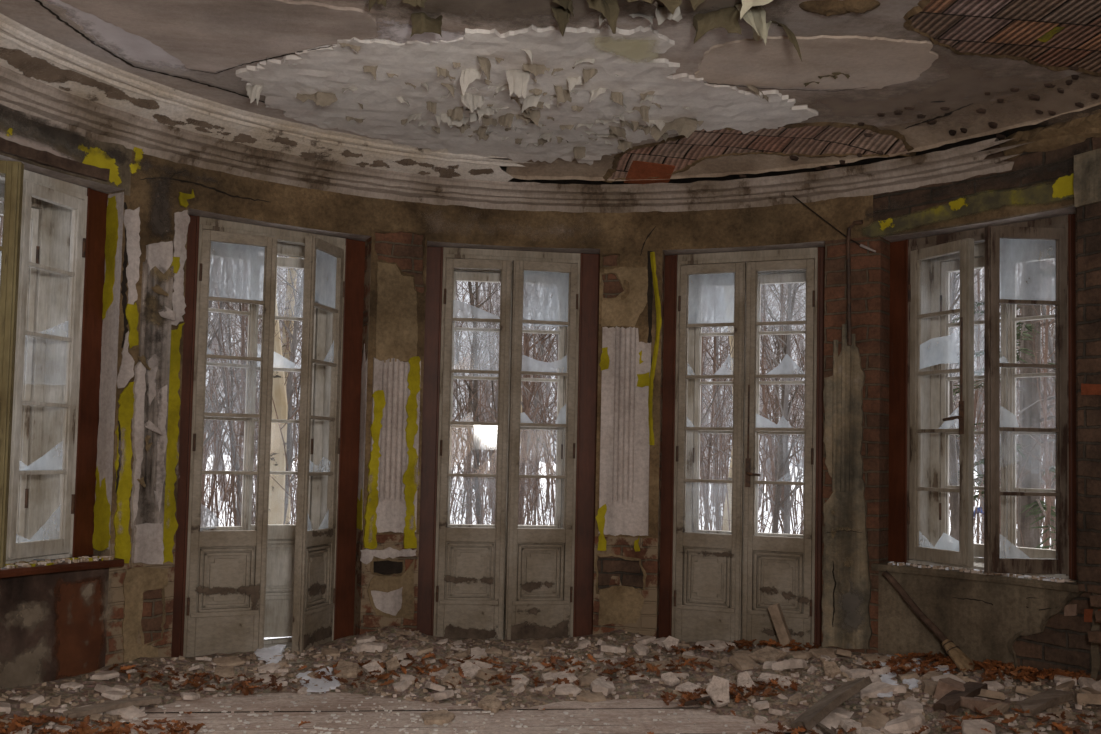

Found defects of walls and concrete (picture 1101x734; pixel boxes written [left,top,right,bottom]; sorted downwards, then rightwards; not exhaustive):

damp [50,0,185,69]
damp [0,104,89,156]
peeling [0,47,316,160]
peeling [60,0,1101,184]
peeling [949,197,968,211]
damp [861,150,1080,238]
peeling [1052,173,1074,198]
peeling [78,143,195,565]
peeling [599,347,610,371]
peeling [637,251,662,445]
peeling [357,343,421,616]
flaking render [594,504,647,594]